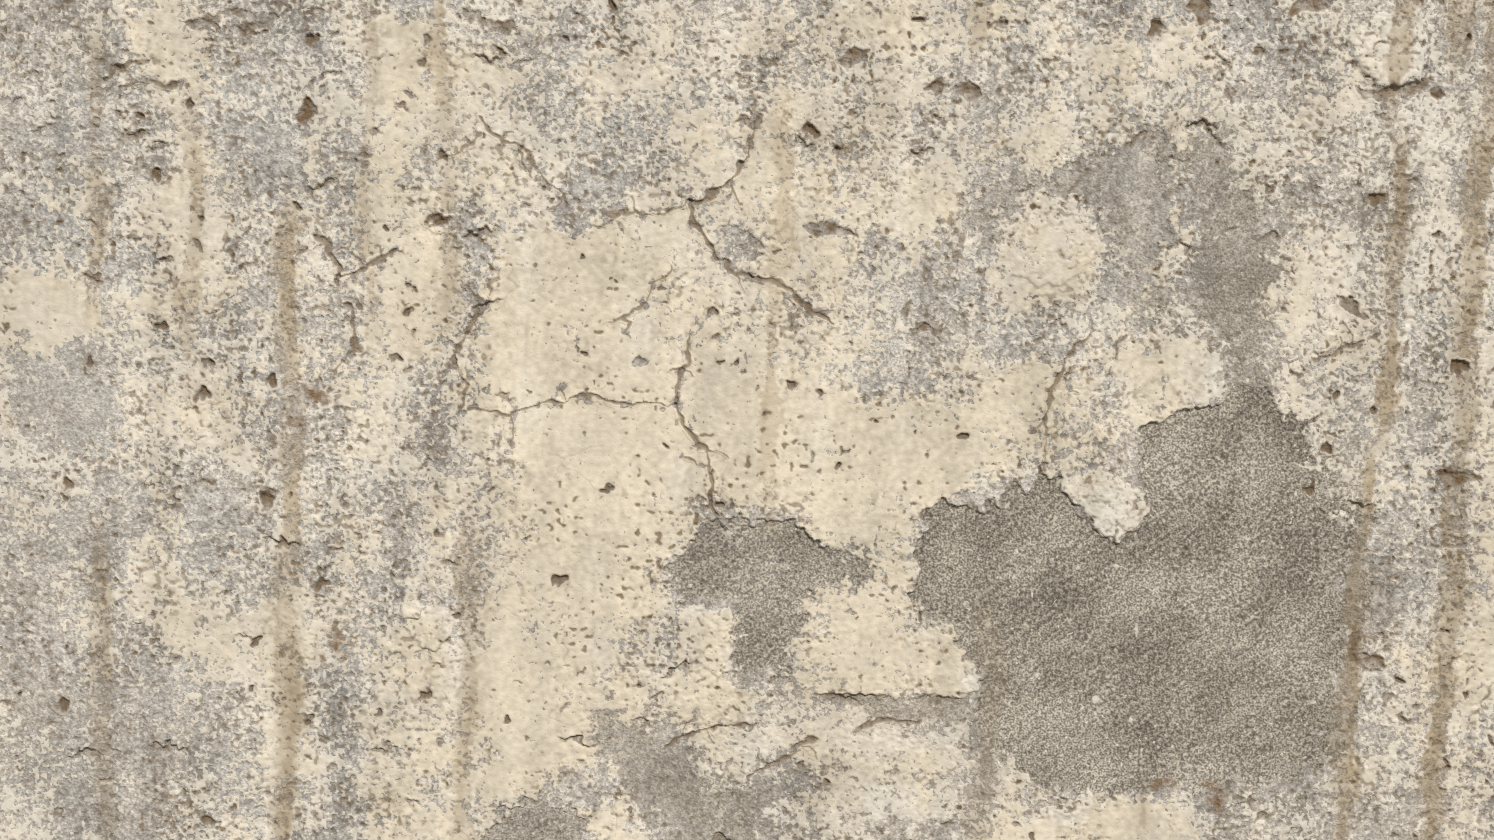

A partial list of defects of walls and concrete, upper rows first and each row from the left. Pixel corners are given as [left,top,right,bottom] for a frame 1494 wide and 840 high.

crack [434,110,839,342]
crack [447,278,731,518]
spalling [574,111,1392,840]
damp [1319,0,1494,840]
spalling [476,790,602,840]